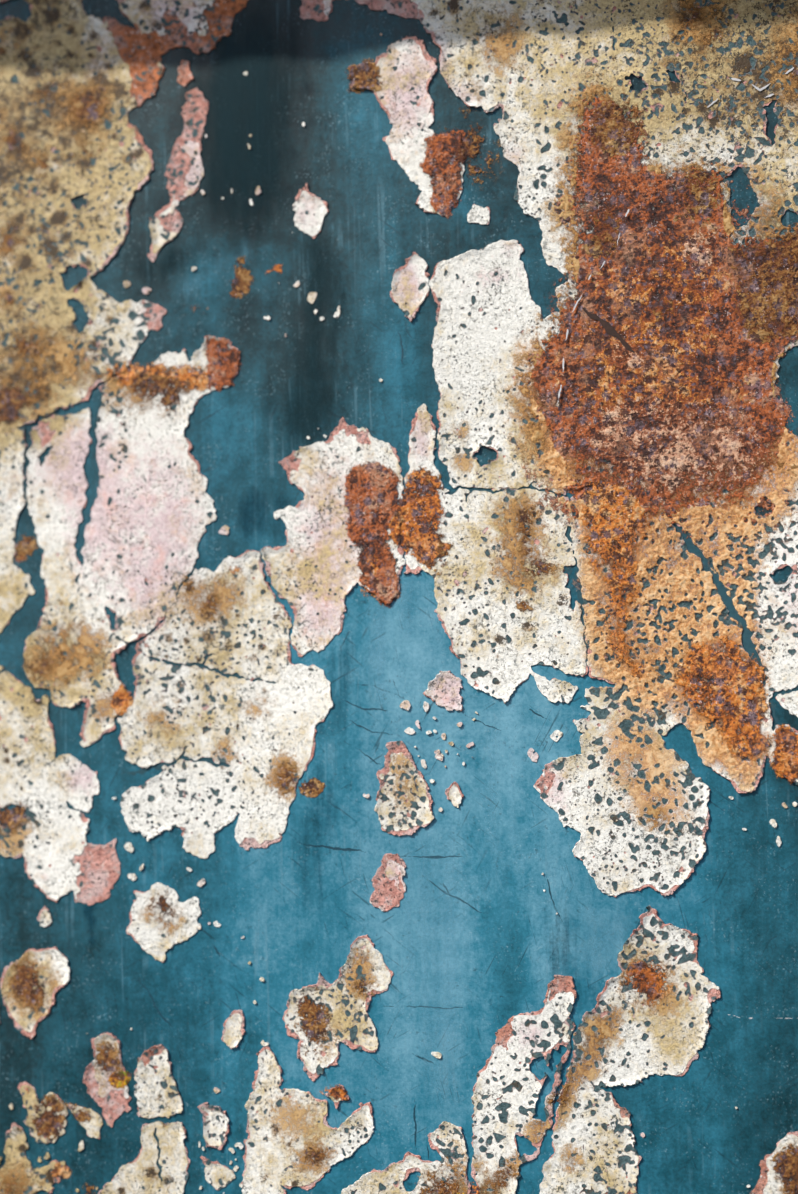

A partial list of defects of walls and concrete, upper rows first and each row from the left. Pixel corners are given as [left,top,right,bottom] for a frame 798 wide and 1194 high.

corrosion [0,325,242,423]
crack [132,646,276,684]
corrosion [344,461,453,608]
peeling [0,0,798,927]
crack [442,481,588,658]
corrosion [490,74,798,830]
crack [668,516,798,731]
peeling [126,882,221,963]
peeling [341,905,721,1194]
corrosion [523,949,680,1143]
peeling [746,1131,798,1194]
corrosion [772,1143,798,1194]